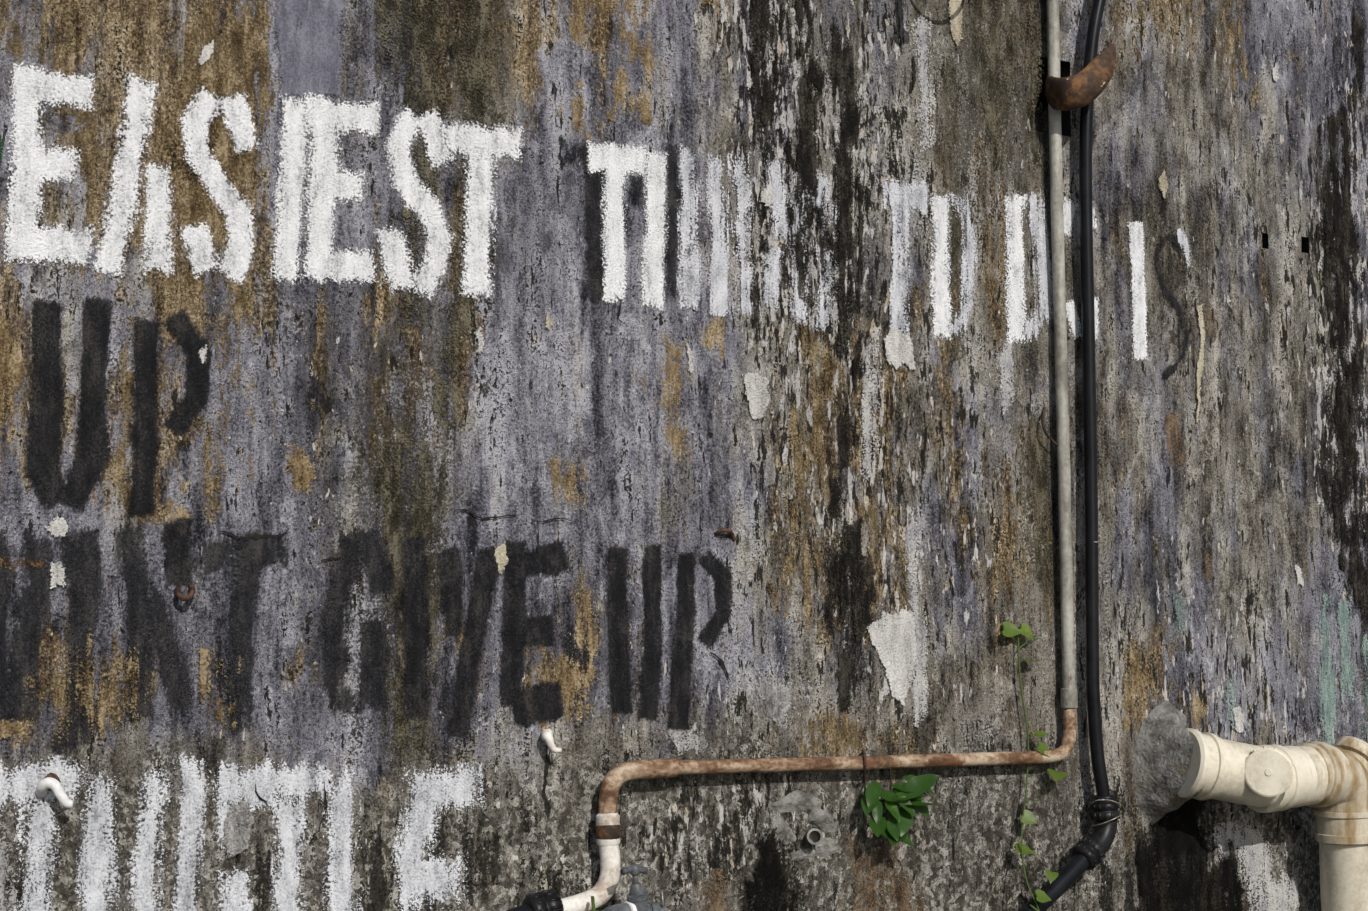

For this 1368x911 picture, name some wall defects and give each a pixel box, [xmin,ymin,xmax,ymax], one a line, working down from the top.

peeling [742,372,771,420]
leakage [746,0,884,713]
peeling [761,319,917,706]
efflorescence [902,504,931,728]
leakage [1312,4,1368,745]
leakage [1132,799,1302,911]